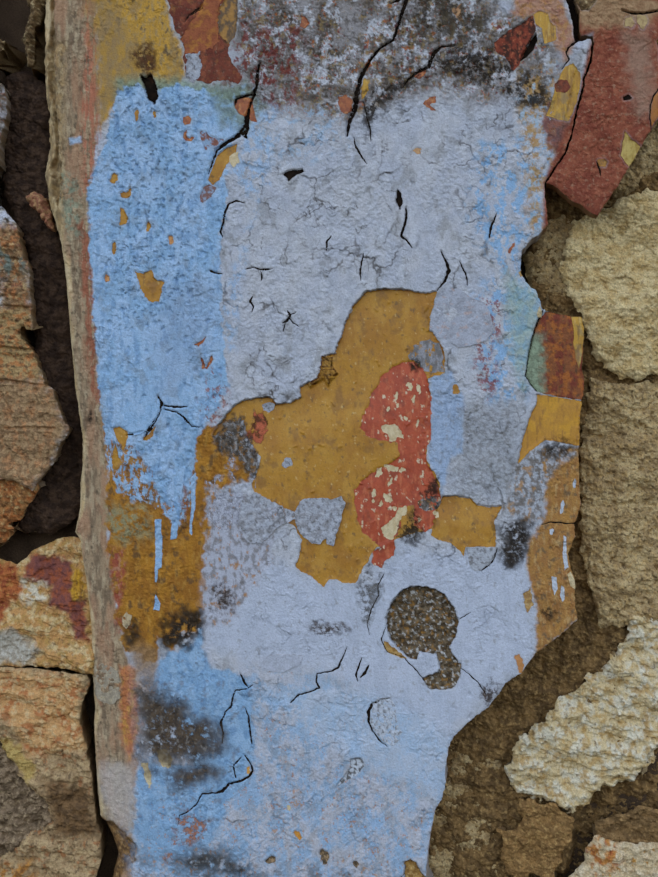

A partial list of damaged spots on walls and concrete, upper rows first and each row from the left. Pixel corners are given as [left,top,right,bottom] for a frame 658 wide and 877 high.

spalling [141,75,158,118]
peeling [167,0,242,84]
crack [347,0,408,164]
crack [404,46,453,86]
peeling [546,63,581,121]
peeling [183,116,240,203]
peeling [135,270,164,302]
crack [128,396,200,439]
peeling [213,289,502,587]
peeling [518,306,584,463]
spalling [384,586,461,690]
crack [178,674,253,824]